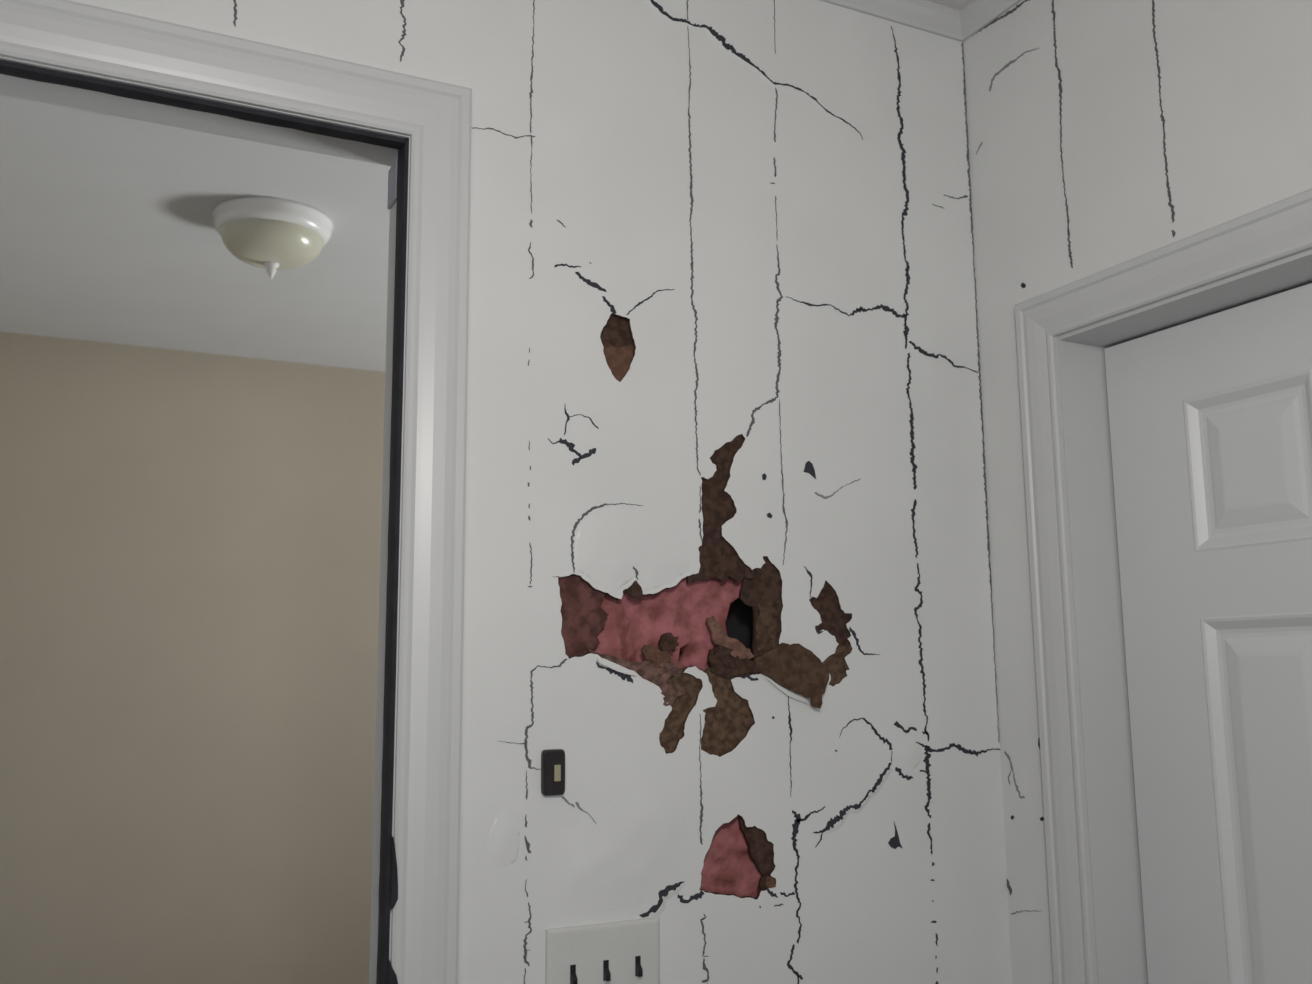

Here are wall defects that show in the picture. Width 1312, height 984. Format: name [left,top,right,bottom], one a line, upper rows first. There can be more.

crack [231,0,239,27]
crack [398,0,407,62]
crack [472,0,566,279]
crack [1152,0,1176,237]
spalling [554,262,675,382]
crack [528,406,643,587]
spalling [558,434,879,757]
crack [639,0,1073,984]
crack [500,658,633,984]
spalling [699,814,776,900]